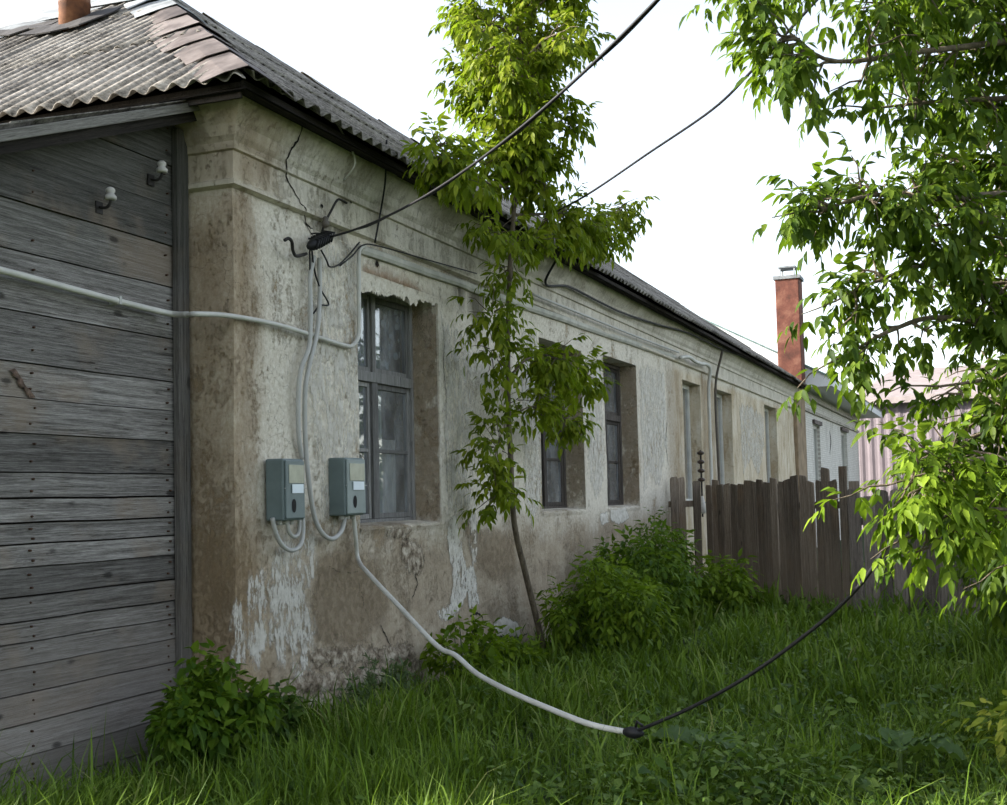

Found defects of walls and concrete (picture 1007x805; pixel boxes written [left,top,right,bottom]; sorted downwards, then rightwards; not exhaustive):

flaking render [387,526,424,577]
peeling [437,512,479,621]